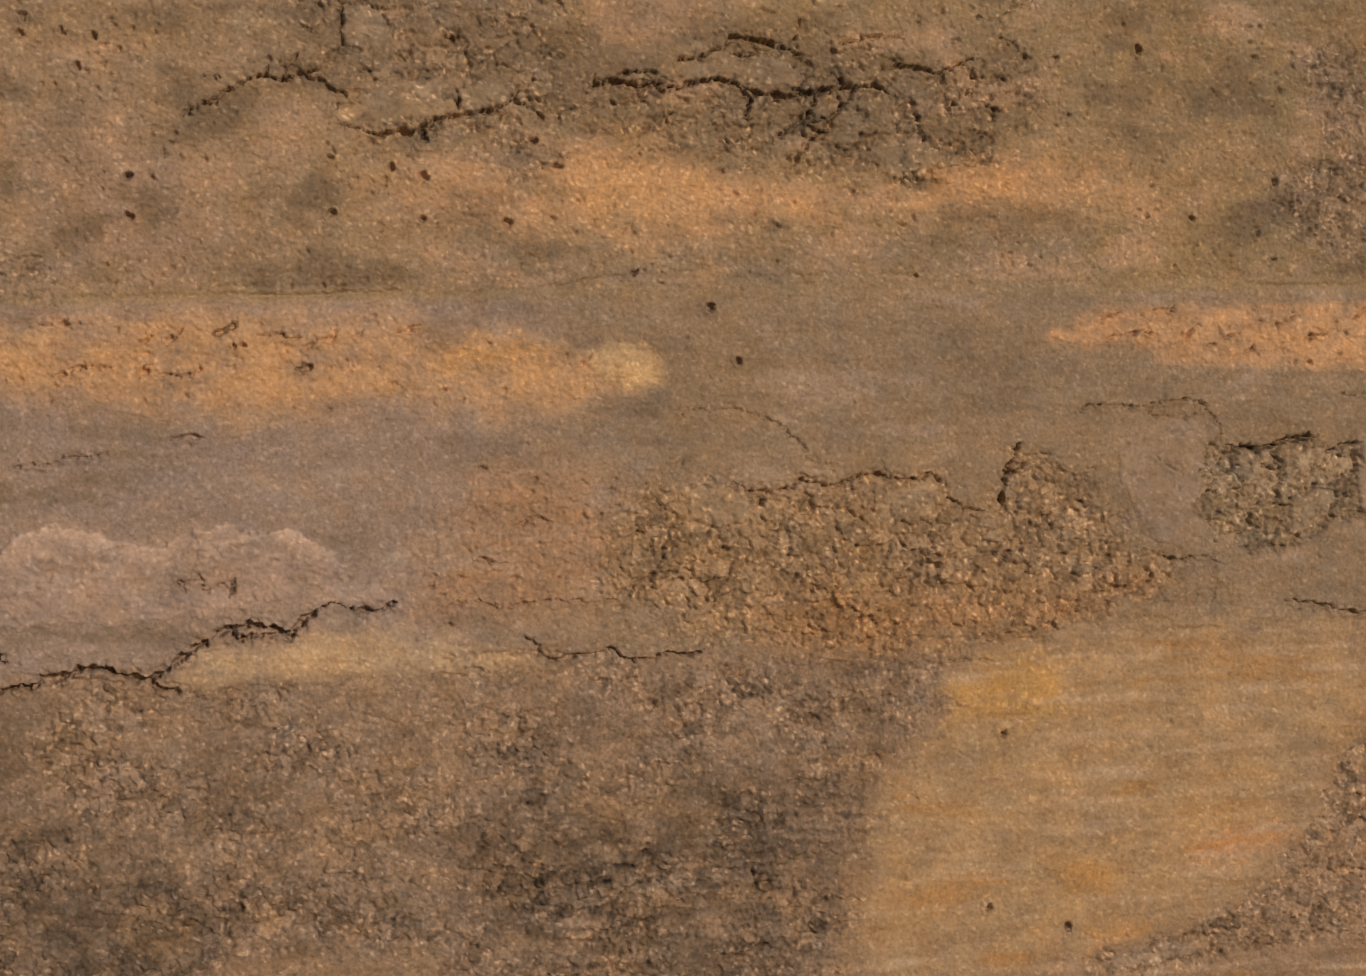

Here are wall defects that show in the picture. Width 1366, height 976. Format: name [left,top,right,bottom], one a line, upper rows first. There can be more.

crack [177,50,546,139]
crack [585,0,1035,172]
crack [1073,396,1361,459]
crack [513,515,556,528]
spalling [1191,436,1363,556]
crack [0,599,398,696]
crack [178,573,234,594]
crack [431,554,718,665]
crack [1284,597,1366,616]
spalling [0,444,1192,976]
spalling [1082,733,1366,976]